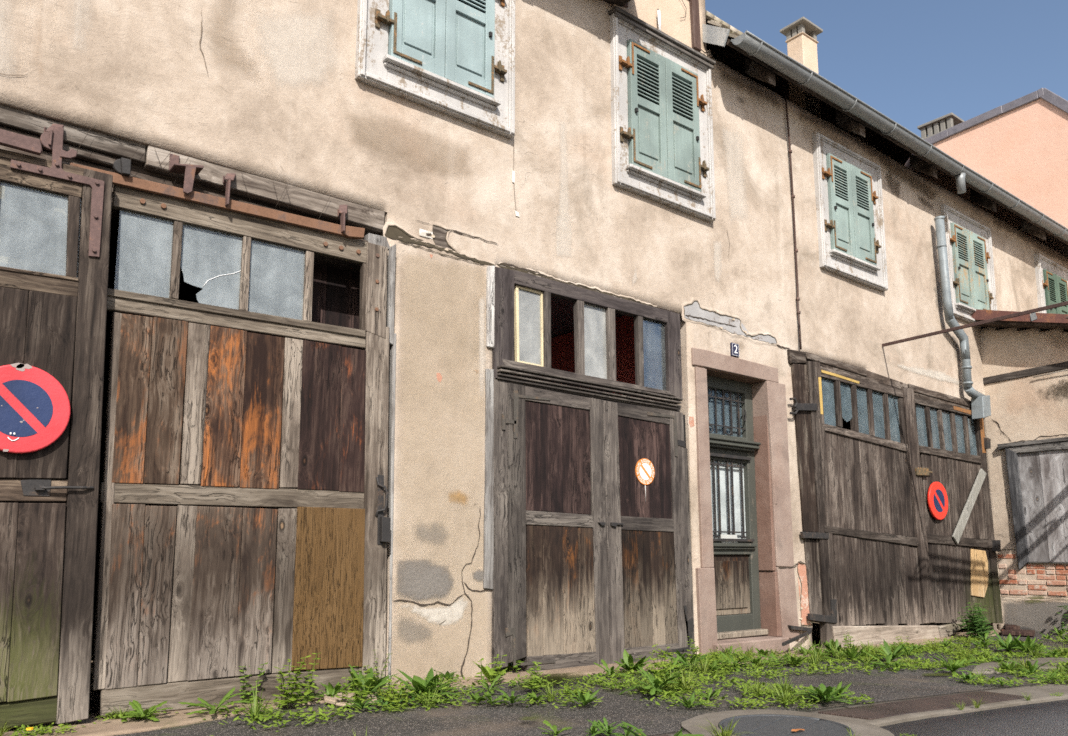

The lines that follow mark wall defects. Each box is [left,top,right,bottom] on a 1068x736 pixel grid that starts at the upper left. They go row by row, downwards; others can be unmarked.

spalling [383,221,460,259]
spalling [681,297,778,347]
water stain [1046,383,1068,399]
crack [395,503,493,678]
spalling [996,546,1068,602]